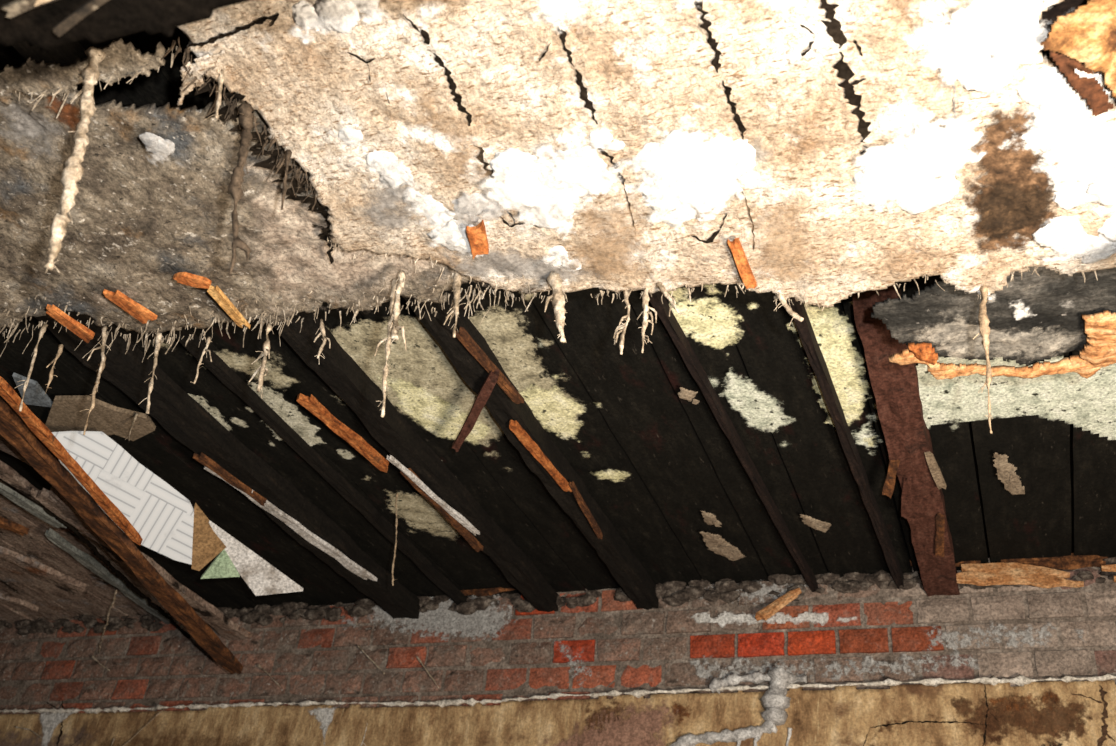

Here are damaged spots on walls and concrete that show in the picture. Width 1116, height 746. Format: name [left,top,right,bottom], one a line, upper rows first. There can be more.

crack [403,14,497,180]
crack [694,0,746,140]
crack [801,0,871,174]
crack [539,25,636,234]
damp [668,285,757,349]
peeling [678,387,700,405]
peeling [595,469,630,482]
peeling [993,453,1025,495]
peeling [700,510,746,561]
damp [692,583,857,627]
damp [691,622,1056,681]
damp [951,691,1091,746]